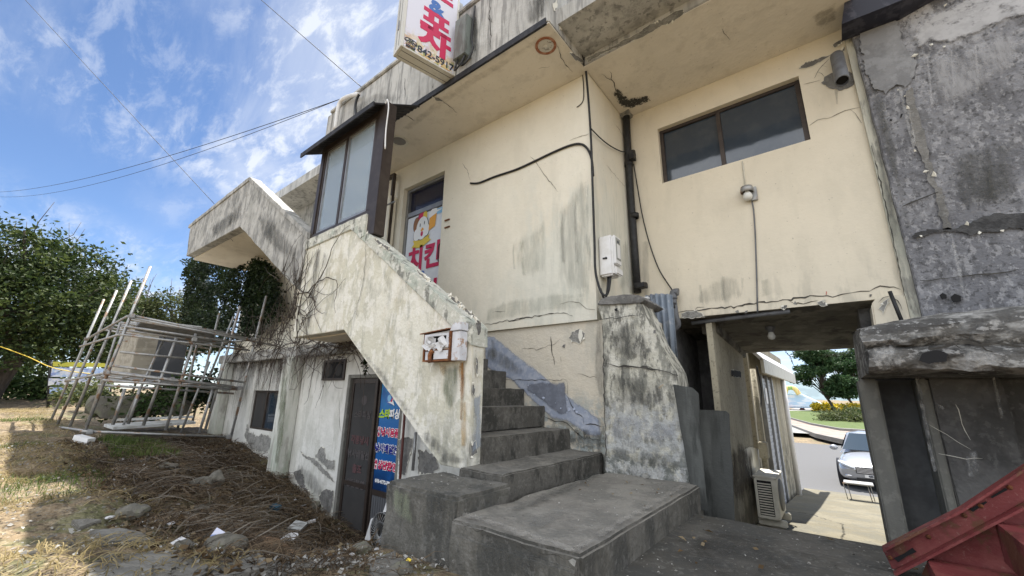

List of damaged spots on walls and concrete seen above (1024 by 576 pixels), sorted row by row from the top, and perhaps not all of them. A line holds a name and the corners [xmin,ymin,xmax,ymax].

peeling [911,0,1024,57]
crack [678,146,1016,313]
flaking render [911,213,1024,238]
flaking render [562,328,585,348]
crack [493,301,676,467]
peeling [293,446,335,515]